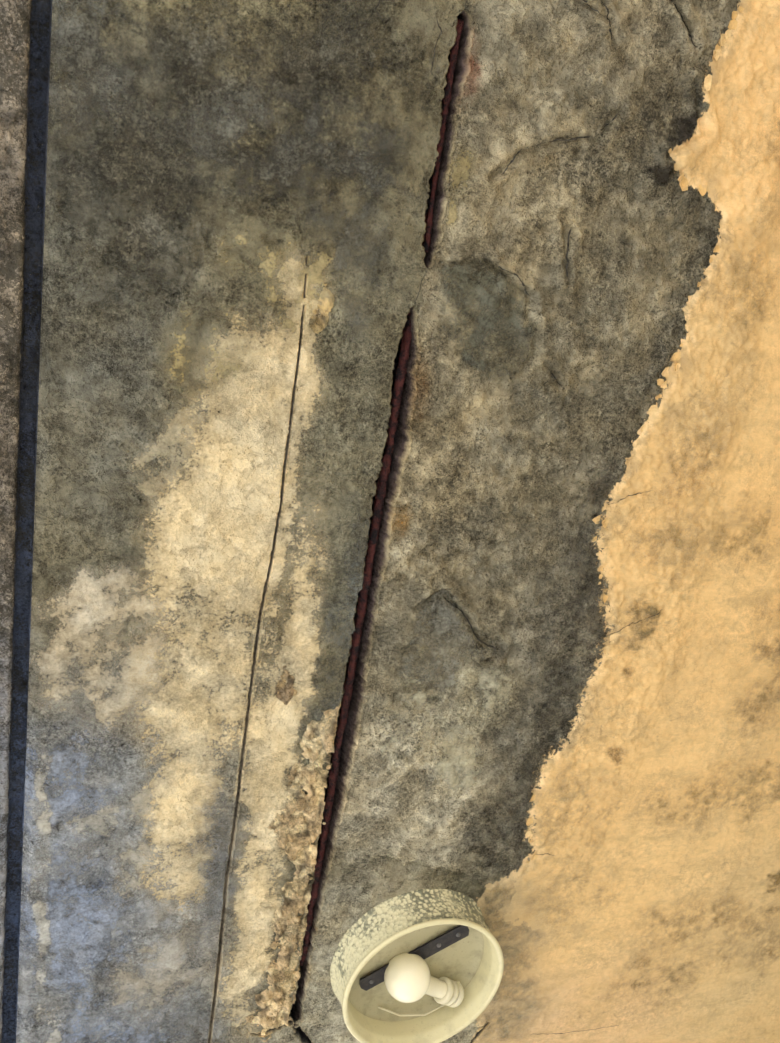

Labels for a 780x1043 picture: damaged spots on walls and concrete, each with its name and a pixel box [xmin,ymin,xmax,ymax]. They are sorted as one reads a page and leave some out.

leakage [46,0,444,333]
leakage [19,725,229,1043]
peeling [30,234,340,1043]
leakage [190,793,240,954]
crack [207,255,310,1043]
leakage [324,540,367,662]
crack [250,1,474,1043]
leakage [379,721,480,792]
crack [444,597,501,664]
crack [469,1022,490,1043]
leakage [477,669,516,719]
peeling [332,0,744,888]